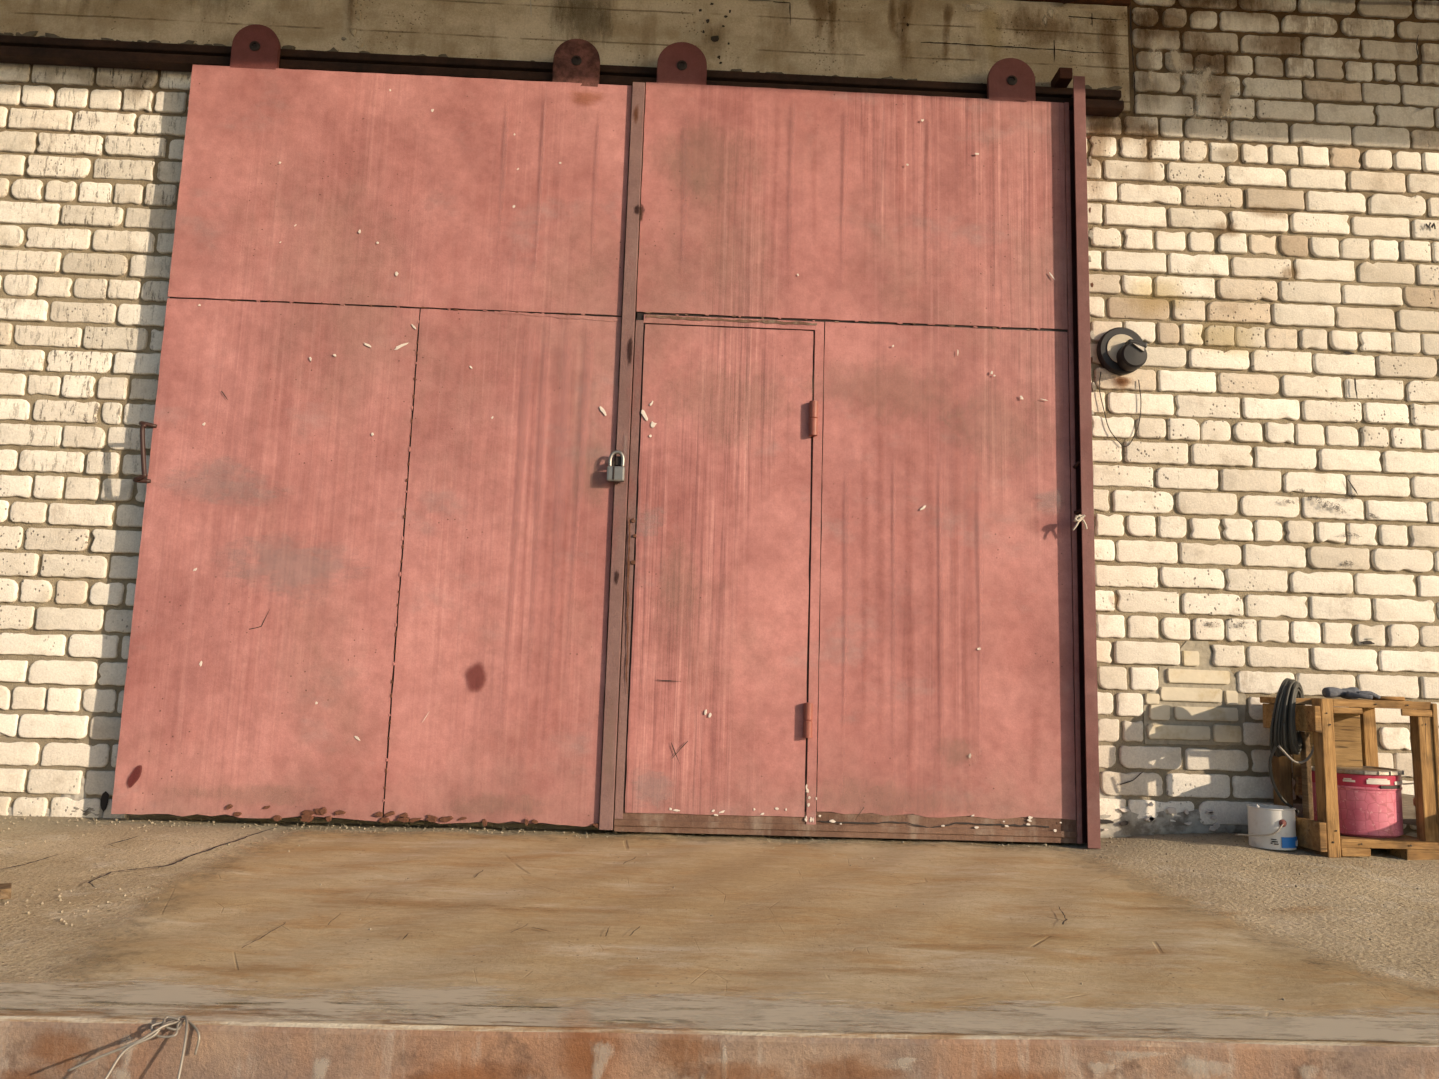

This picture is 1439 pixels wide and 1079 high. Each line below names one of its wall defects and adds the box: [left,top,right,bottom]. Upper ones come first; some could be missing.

rust [300,807,346,823]
rust [375,811,487,827]